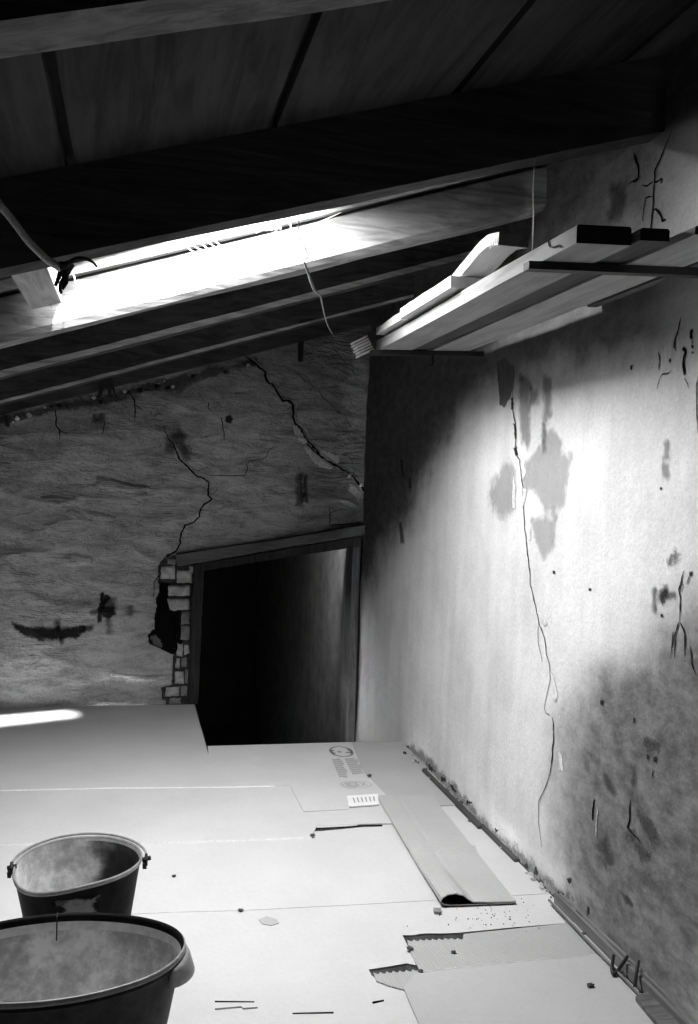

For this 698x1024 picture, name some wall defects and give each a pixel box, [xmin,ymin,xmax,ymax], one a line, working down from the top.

crack [628,130,672,228]
peeling [497,358,514,407]
crack [657,318,698,433]
crack [121,355,364,598]
water stain [14,592,116,644]
spalling [148,553,196,704]
crack [511,367,563,847]
crack [670,571,696,675]
water stain [627,807,658,860]